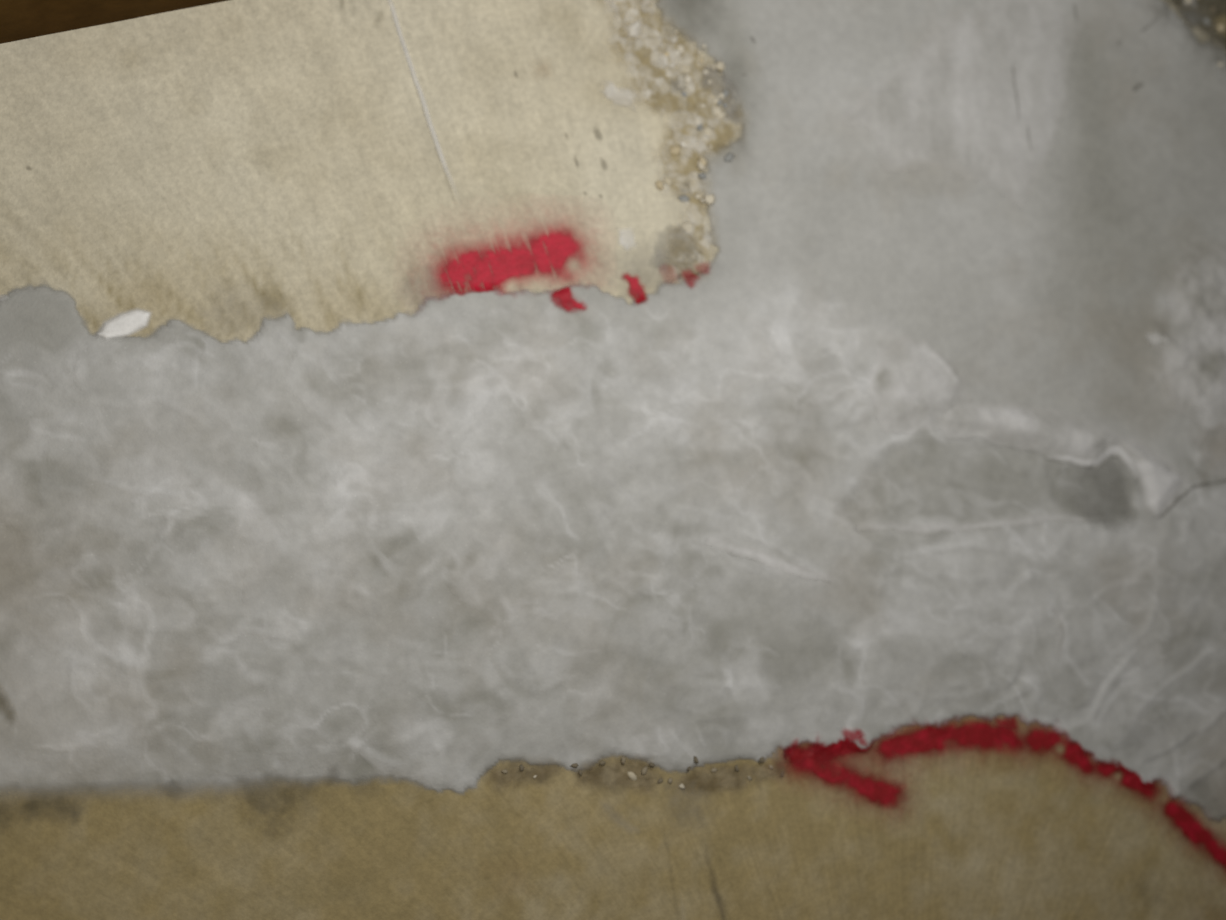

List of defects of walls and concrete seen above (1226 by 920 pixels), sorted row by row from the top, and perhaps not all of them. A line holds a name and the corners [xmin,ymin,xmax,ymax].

spalling [1176,0,1226,45]
spalling [604,0,739,274]
spalling [97,310,150,339]